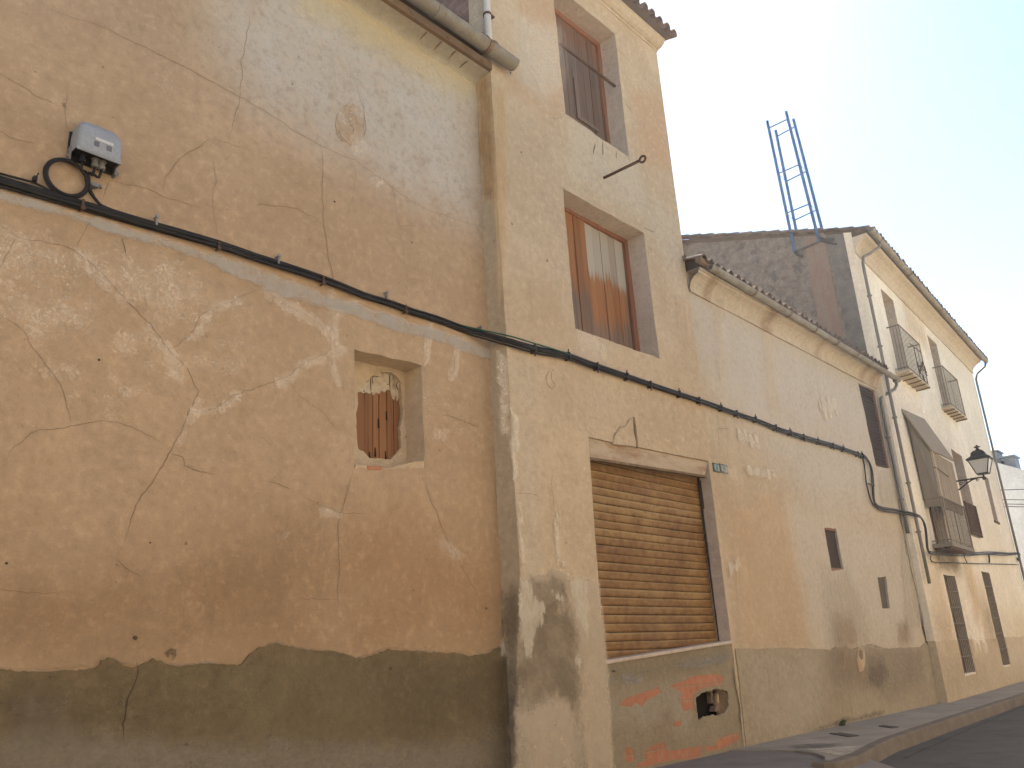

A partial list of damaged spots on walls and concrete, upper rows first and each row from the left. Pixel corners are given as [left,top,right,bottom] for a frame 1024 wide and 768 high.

crack [0,2,482,577]
damp [502,580,578,768]
flaking render [620,674,724,727]
flaking render [624,732,739,767]